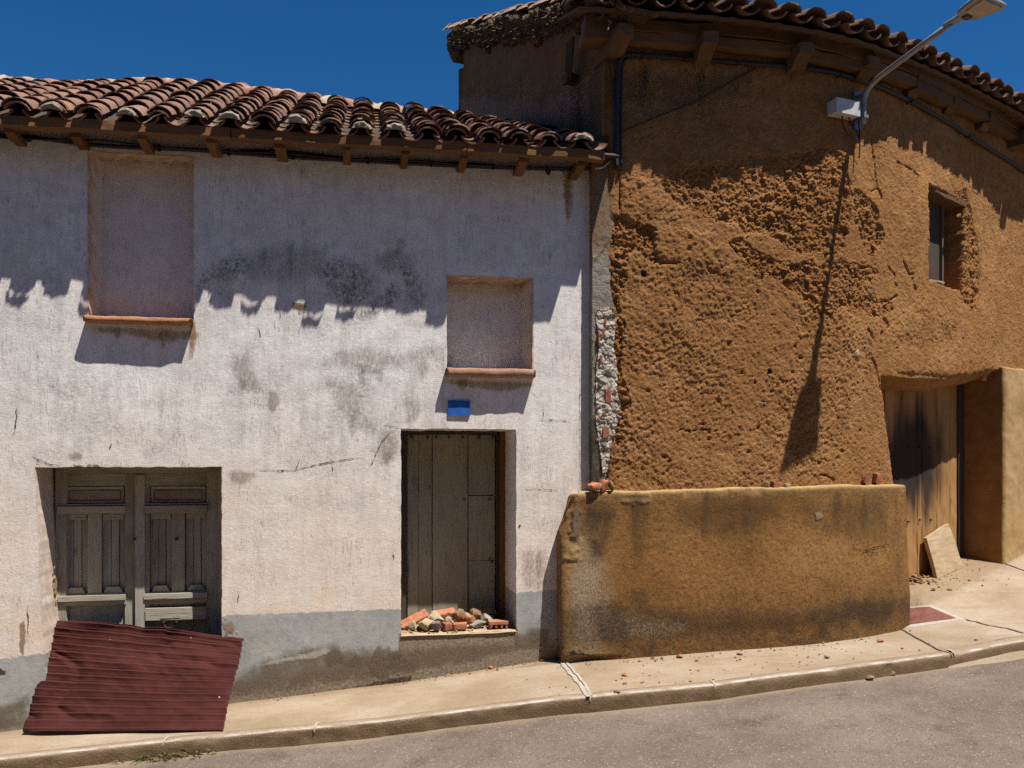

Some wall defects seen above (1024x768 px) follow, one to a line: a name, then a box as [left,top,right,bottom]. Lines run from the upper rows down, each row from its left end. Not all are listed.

flaking render [595,293,630,474]
crack [254,425,395,472]
leakage [232,629,548,691]